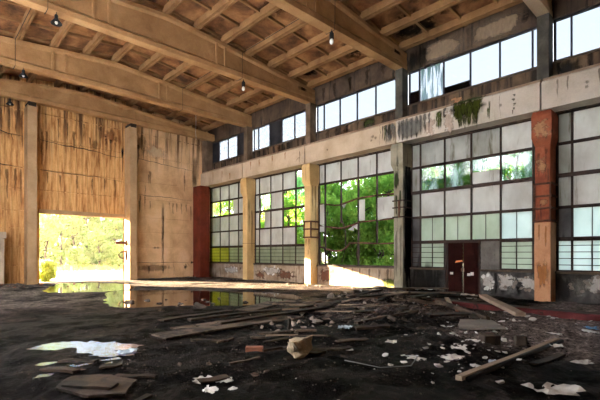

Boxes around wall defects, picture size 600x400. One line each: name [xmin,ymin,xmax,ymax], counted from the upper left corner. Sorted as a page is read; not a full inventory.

leakage [382,98,489,141]
spalling [255,266,296,281]
flaking render [481,272,534,292]
flaking render [568,276,600,297]